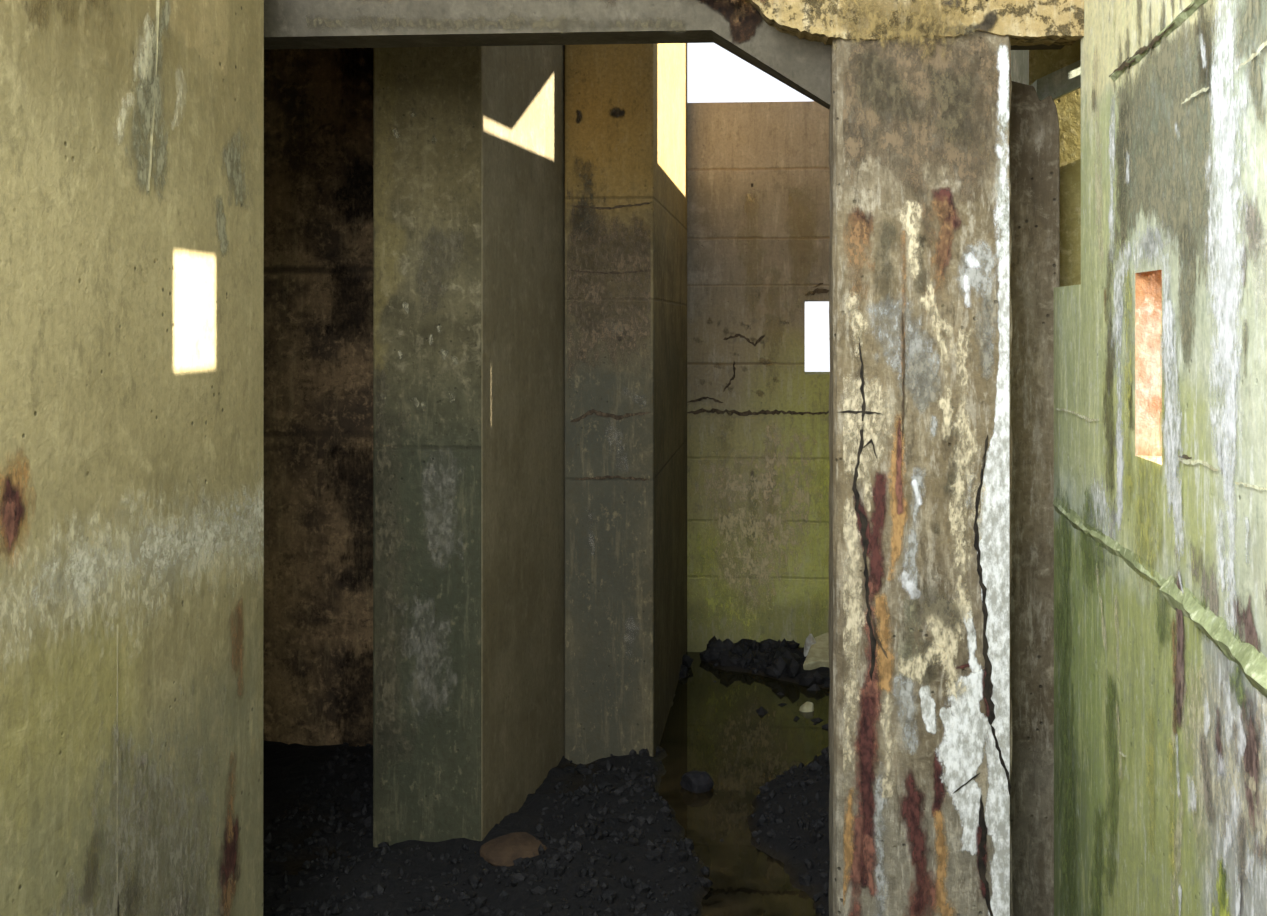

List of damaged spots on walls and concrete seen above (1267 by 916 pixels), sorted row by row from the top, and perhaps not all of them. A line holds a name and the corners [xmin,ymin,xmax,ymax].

crack [573,202,650,210]
damp [1089,0,1267,652]
corrosion [0,454,29,561]
crack [571,409,650,422]
damp [697,426,812,602]
crack [687,311,906,680]
peeling [843,46,1010,916]
corrosion [843,417,907,916]
crack [954,435,1011,916]
corrosion [1172,609,1185,733]
corrosion [900,752,955,916]